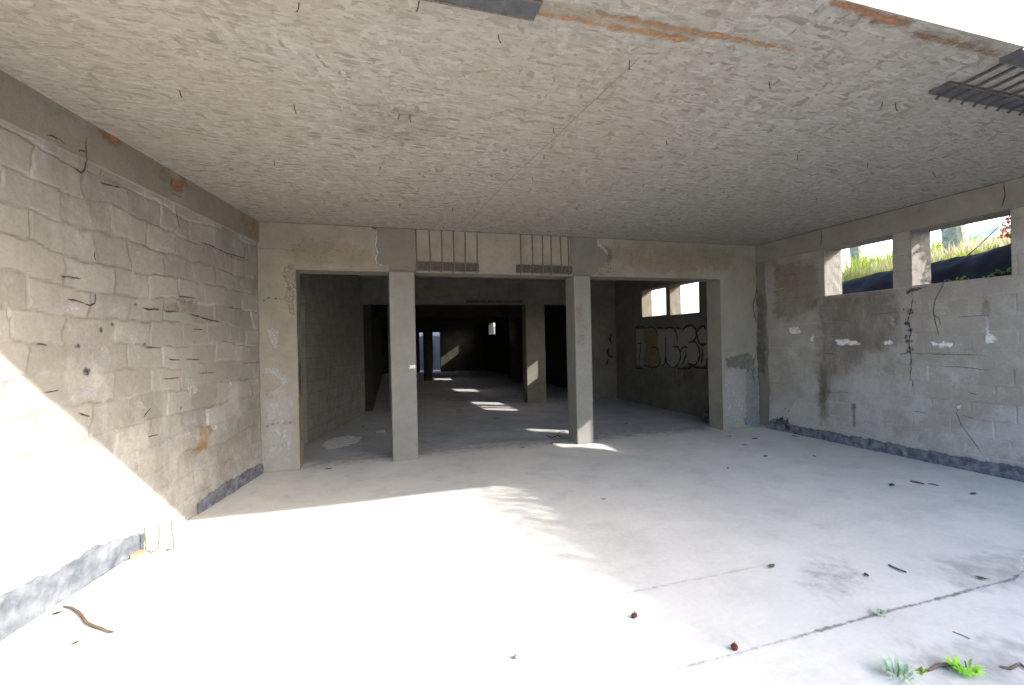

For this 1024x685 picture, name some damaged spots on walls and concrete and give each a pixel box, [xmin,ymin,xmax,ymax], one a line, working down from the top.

rust [539,9,792,51]
rust [831,1,910,25]
spalling [928,47,1024,116]
crack [47,135,120,188]
crack [144,59,1024,463]